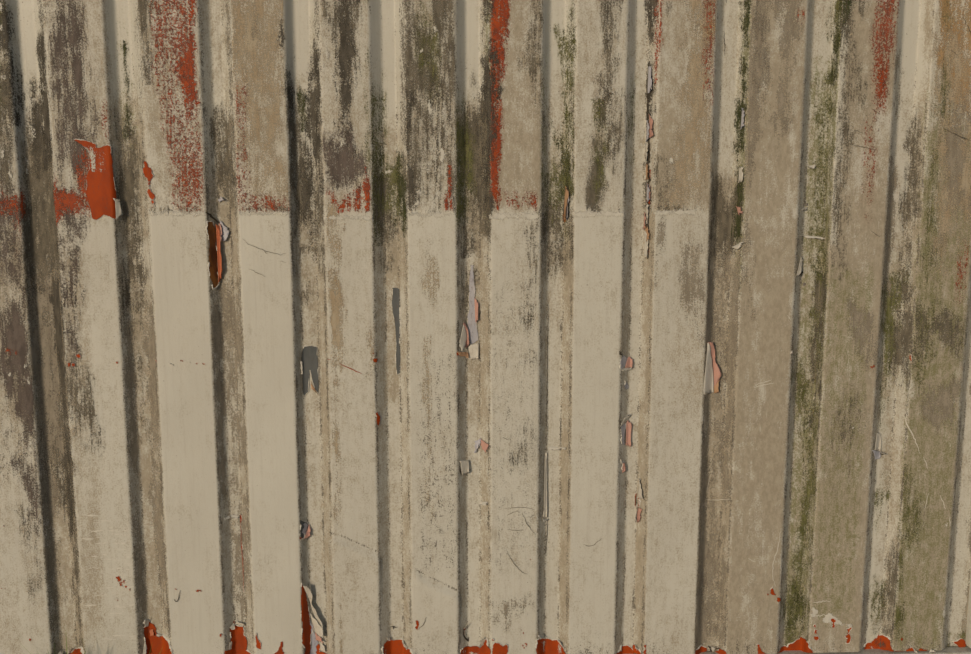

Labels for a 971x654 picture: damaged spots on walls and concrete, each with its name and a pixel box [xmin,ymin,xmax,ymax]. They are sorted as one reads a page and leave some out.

peeling [53,101,123,227]
peeling [142,161,155,207]
peeling [148,0,204,212]
water stain [284,0,371,274]
peeling [489,0,537,213]
peeling [862,0,899,203]
water stain [0,0,101,642]
peeling [300,345,319,396]
peeling [143,618,174,654]
peeling [219,620,262,654]
peeling [300,583,325,654]
water stain [871,536,899,637]